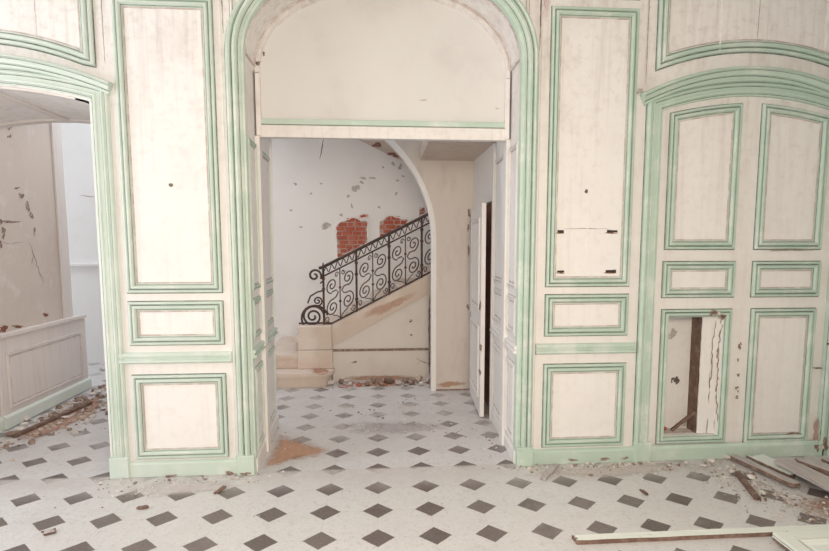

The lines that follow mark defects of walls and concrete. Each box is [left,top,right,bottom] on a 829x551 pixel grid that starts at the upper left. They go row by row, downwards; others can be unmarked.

flaking render [321,177,427,259]